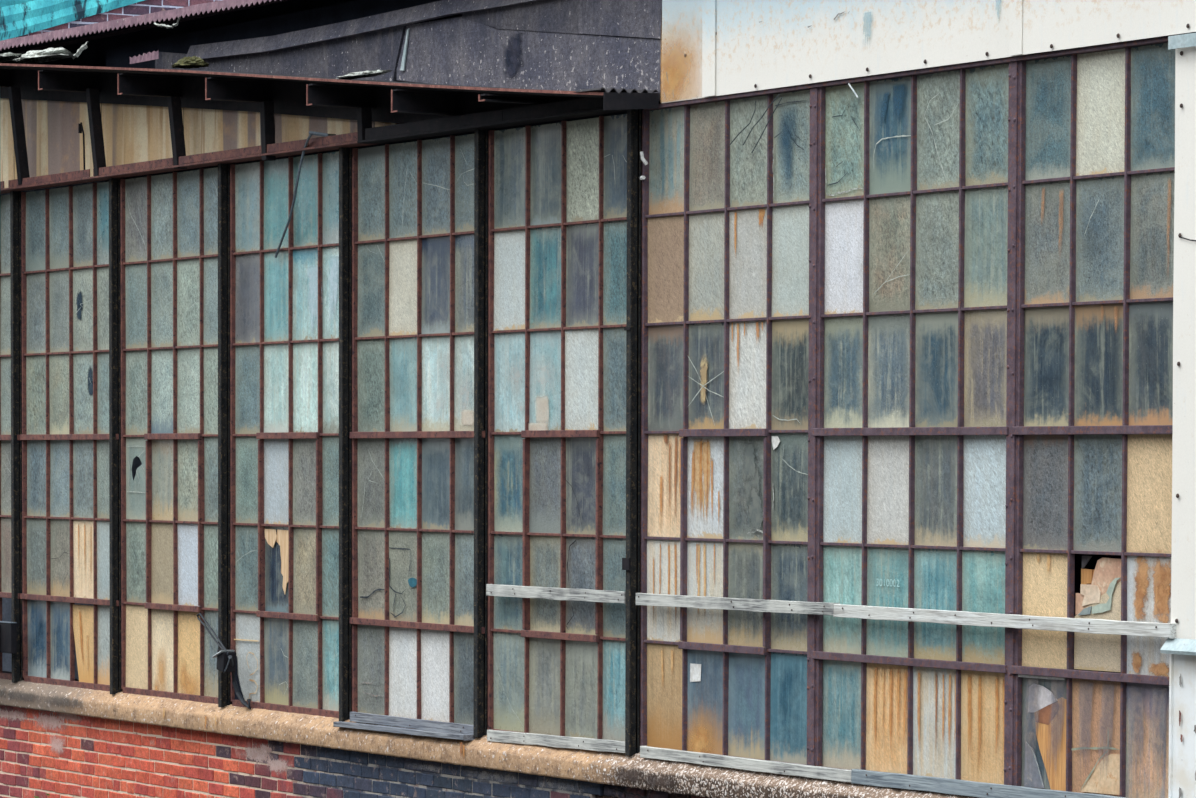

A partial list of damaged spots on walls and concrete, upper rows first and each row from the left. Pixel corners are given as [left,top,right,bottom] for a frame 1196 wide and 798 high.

corrosion [661,43,691,98]
corrosion [731,322,763,366]
corrosion [660,435,720,521]
corrosion [1134,551,1171,623]
corrosion [1132,652,1169,677]
corrosion [874,669,920,745]
corrosion [935,674,1005,750]